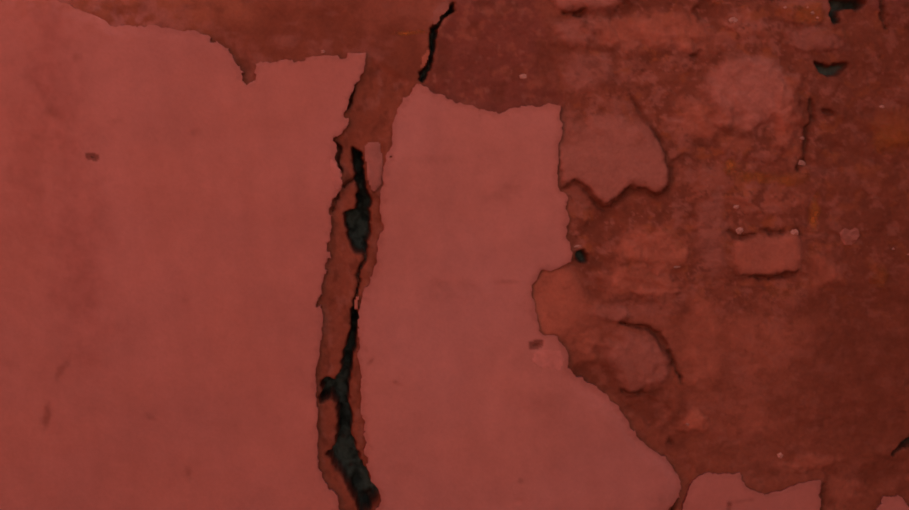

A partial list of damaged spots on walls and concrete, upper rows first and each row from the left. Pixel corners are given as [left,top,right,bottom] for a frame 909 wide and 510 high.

spalling [58,0,557,114]
crack [315,0,453,510]
spalling [532,0,909,510]
crack [668,483,689,510]
crack [819,483,827,510]